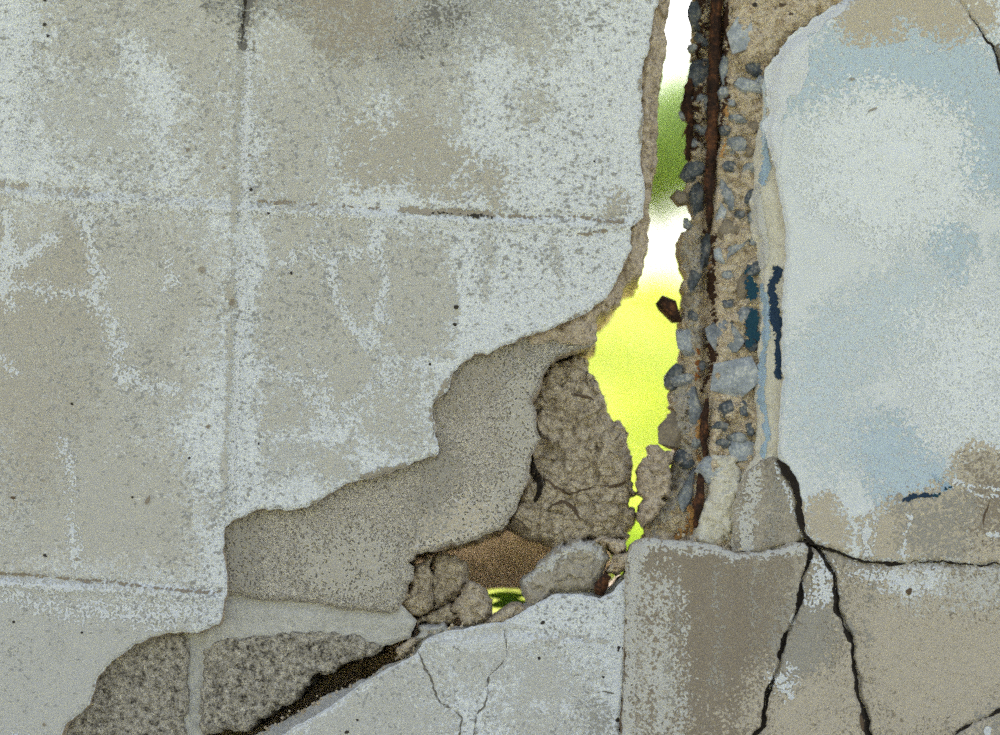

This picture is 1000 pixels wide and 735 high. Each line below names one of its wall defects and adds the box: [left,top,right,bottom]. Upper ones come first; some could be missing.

rust [720,0,733,56]
crack [969,14,1000,72]
rust [691,72,731,158]
peeling [596,184,636,232]
spalling [640,0,769,541]
rust [702,229,719,324]
peeling [0,0,620,735]
rust [694,336,718,393]
spalling [716,526,732,551]
crack [752,460,1000,735]
crack [418,631,507,735]
crack [587,648,626,734]